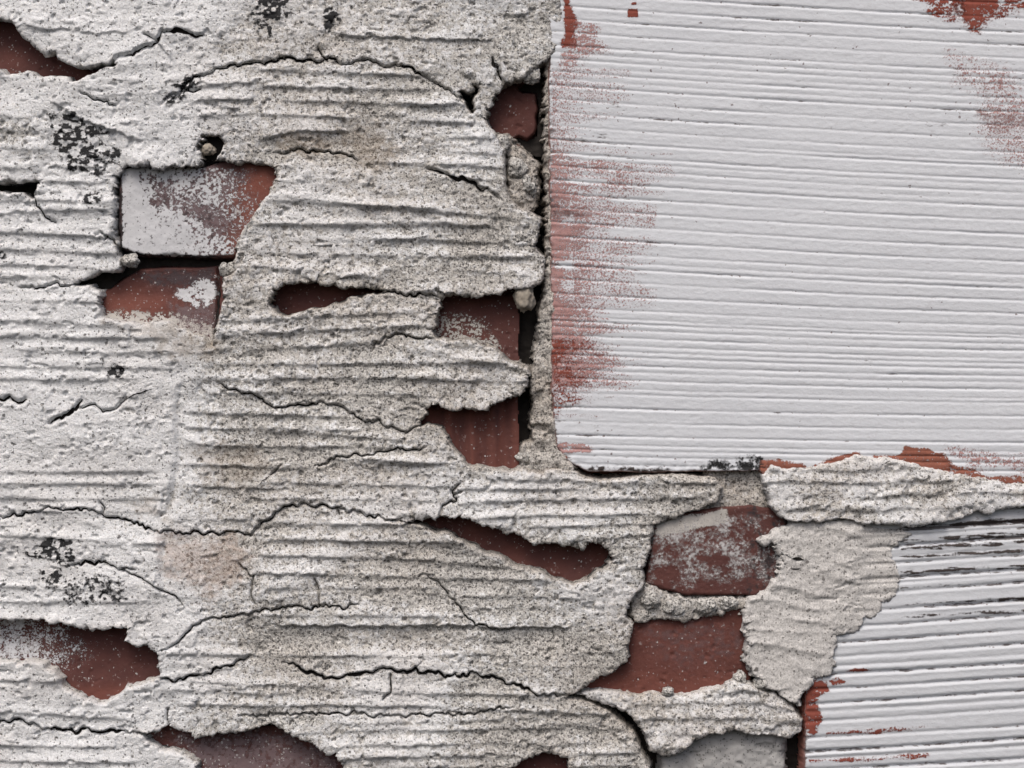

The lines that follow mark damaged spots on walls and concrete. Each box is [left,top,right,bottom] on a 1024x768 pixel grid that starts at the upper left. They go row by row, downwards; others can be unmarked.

crack [118,27,203,57]
crack [170,49,461,100]
spalling [101,161,277,343]
crack [0,503,403,536]
spalling [414,516,612,581]
spalling [644,505,788,596]
crack [75,560,360,650]
spalling [0,619,160,700]
crack [241,662,558,718]
spalling [586,609,750,693]
crack [0,718,140,735]
spalling [147,725,343,768]